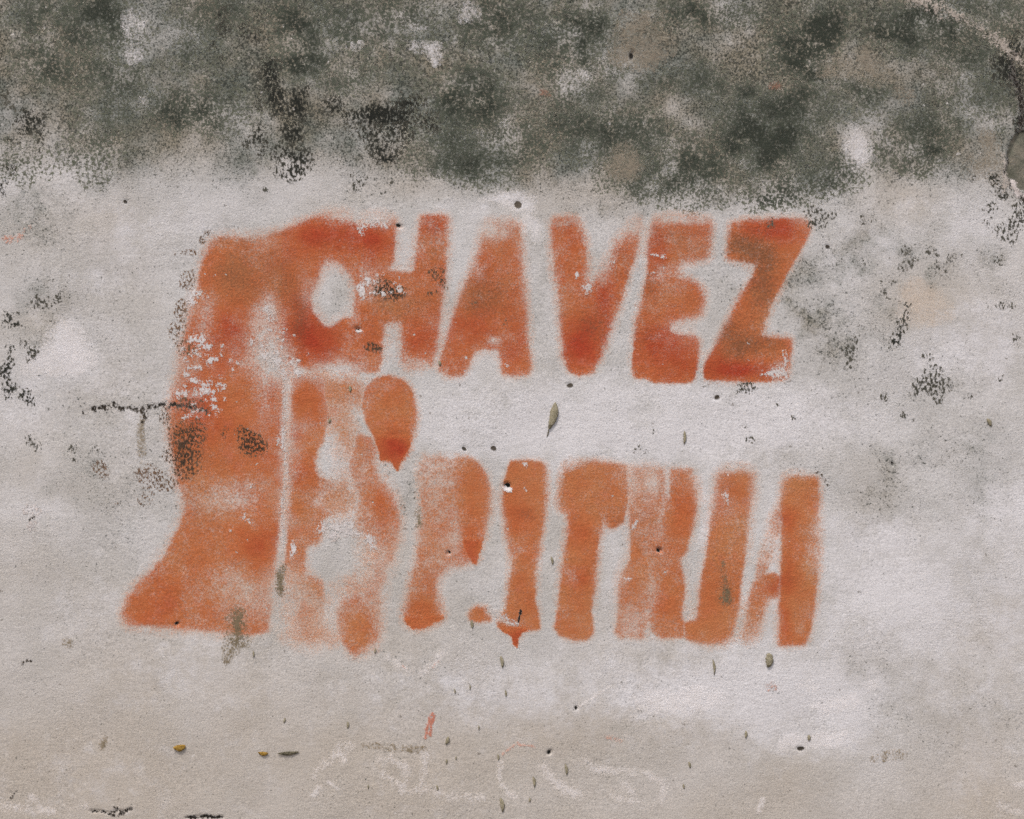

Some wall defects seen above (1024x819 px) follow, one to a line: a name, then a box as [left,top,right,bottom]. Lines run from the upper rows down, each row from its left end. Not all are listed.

leakage [0,0,1024,246]